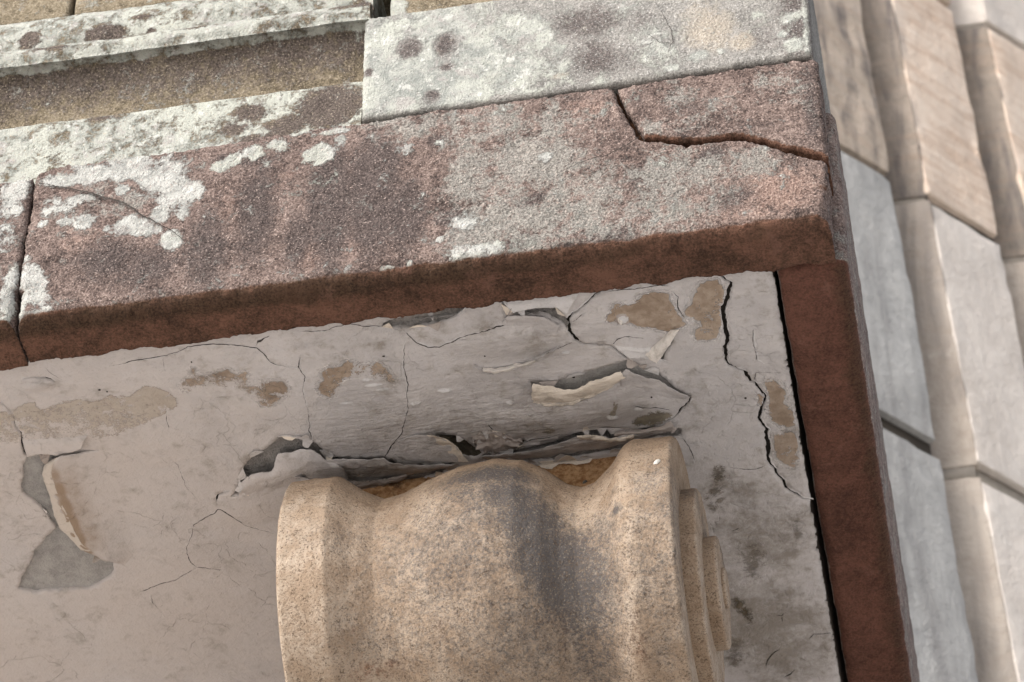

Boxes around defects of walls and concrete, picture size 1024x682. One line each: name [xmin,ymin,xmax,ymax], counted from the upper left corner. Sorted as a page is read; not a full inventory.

crack [39,183,184,241]
crack [0,401,27,455]
crack [110,336,313,440]
peeling [382,308,468,331]
crack [384,324,504,456]
peeling [235,421,681,501]
peeling [474,293,579,375]
peeling [522,329,689,407]
crack [546,285,687,360]
crack [721,275,813,500]
peeling [19,435,134,590]
crack [144,459,277,617]